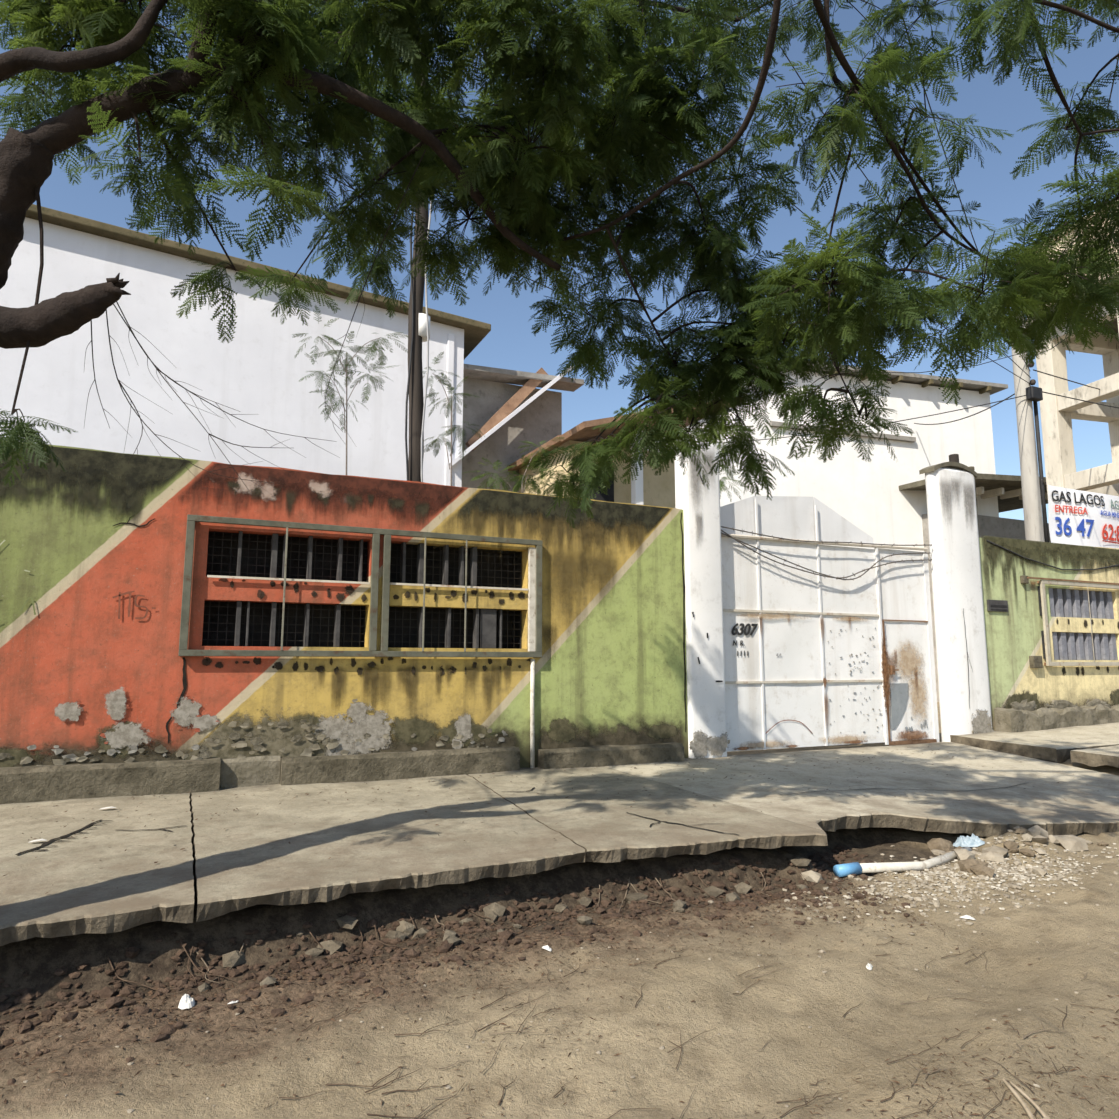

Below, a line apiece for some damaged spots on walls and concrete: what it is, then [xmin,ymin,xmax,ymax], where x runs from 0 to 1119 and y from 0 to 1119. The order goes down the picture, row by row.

leakage [0,442,191,520]
leakage [983,535,1119,594]
crack [166,657,187,744]
spalling [0,687,397,766]
leakage [293,713,323,737]
leakage [202,657,532,701]
leakage [325,716,517,756]
rust [881,638,926,716]
rust [898,730,928,741]
crack [15,820,187,855]